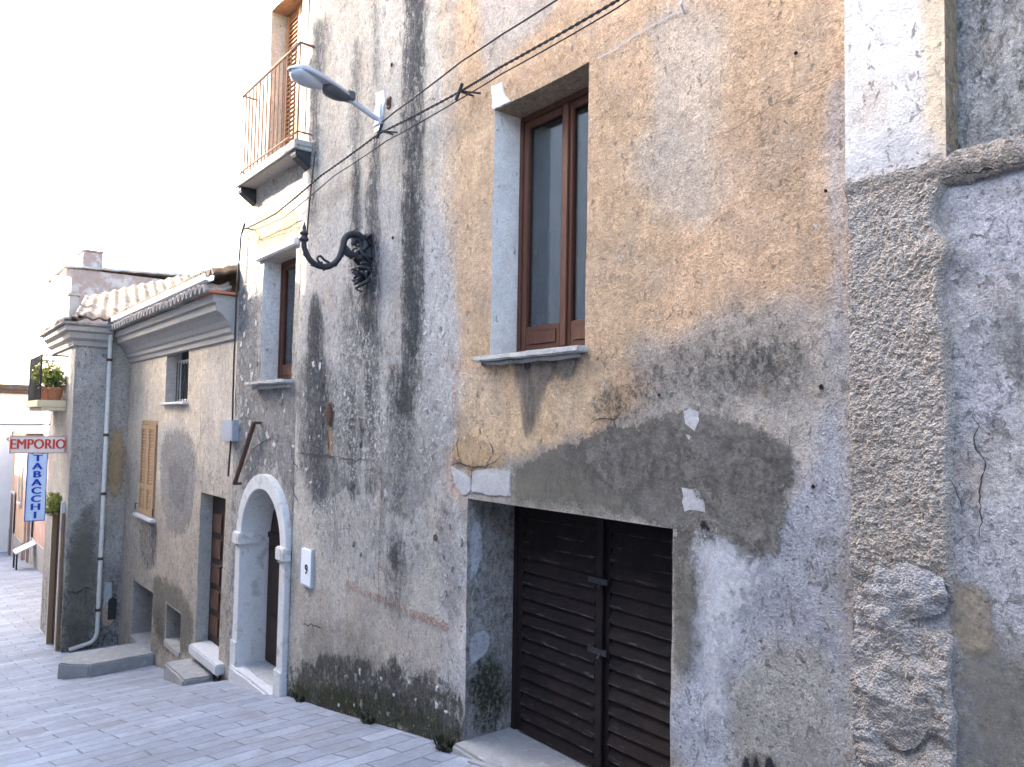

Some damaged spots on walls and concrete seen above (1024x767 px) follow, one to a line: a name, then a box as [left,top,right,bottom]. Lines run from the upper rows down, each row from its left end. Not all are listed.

leakage [309,17,329,72]
leakage [309,89,321,205]
leakage [340,0,428,516]
leakage [64,505,96,651]
leakage [139,431,195,651]
leakage [306,291,329,507]
crack [452,434,497,478]
leakage [505,339,805,725]
crack [951,413,986,536]